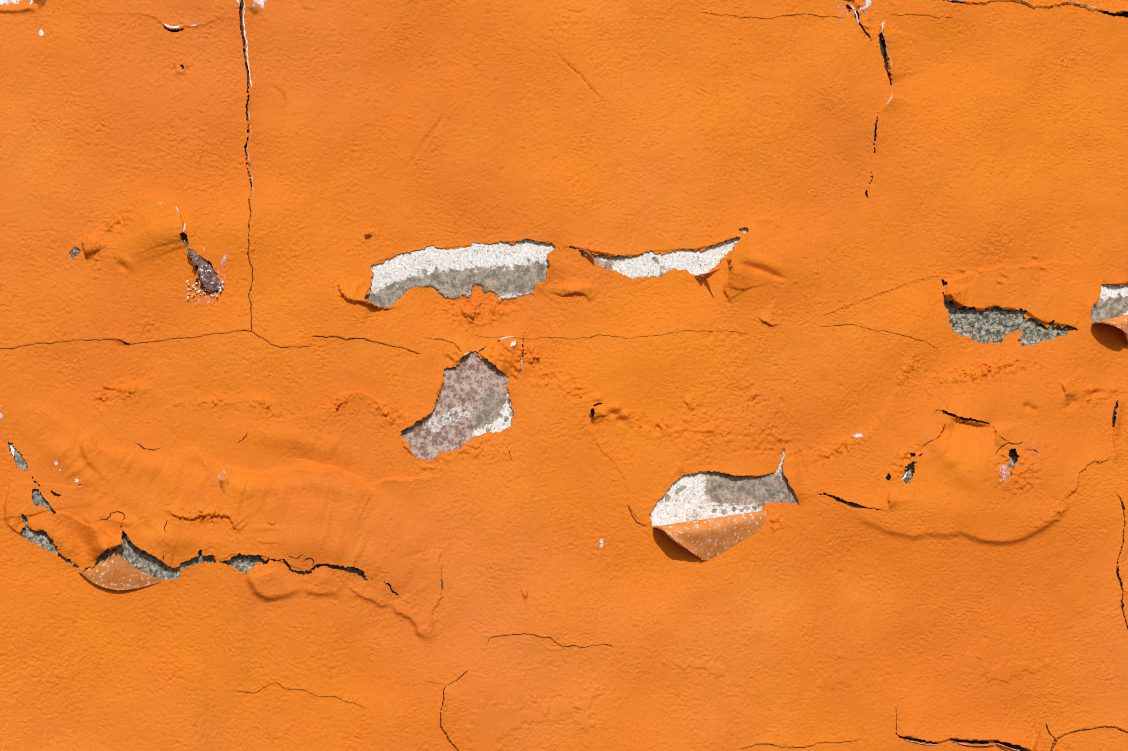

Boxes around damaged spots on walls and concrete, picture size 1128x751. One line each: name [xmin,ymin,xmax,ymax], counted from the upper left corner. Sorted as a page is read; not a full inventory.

spalling [0,0,53,18]
crack [697,10,849,23]
crack [865,10,958,198]
crack [0,0,753,359]
peeling [330,216,828,472]
peeling [938,254,1128,352]
peeling [628,444,807,566]
crack [1102,390,1128,641]
crack [484,631,619,652]
crack [418,671,467,751]
crack [736,737,863,751]
crack [890,714,1128,751]